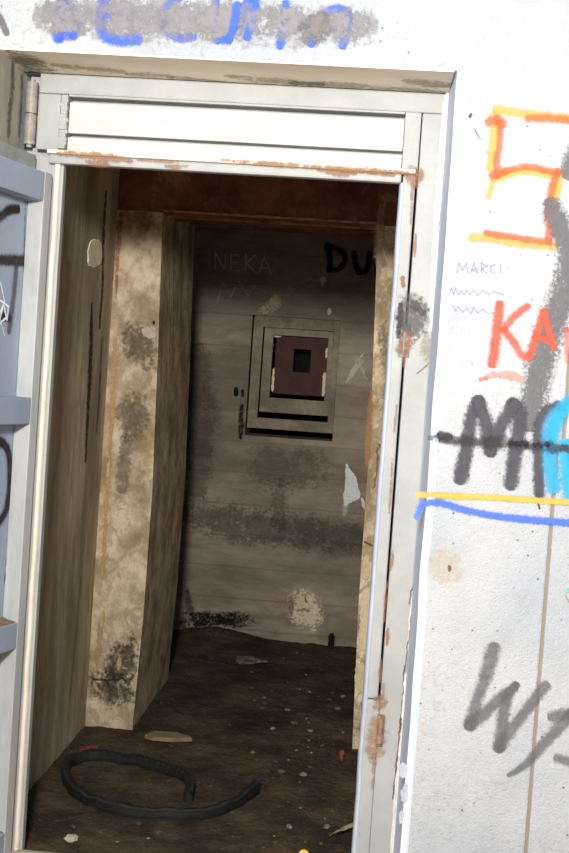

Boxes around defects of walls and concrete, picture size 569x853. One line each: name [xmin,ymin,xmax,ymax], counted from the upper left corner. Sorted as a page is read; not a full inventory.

corrosion [221,159,423,188]
damp [123,321,157,369]
damp [379,301,425,364]
peeling [343,464,365,509]
crack [372,444,380,490]
spalling [288,587,324,632]
mould [89,633,138,706]
corrosion [366,696,387,763]